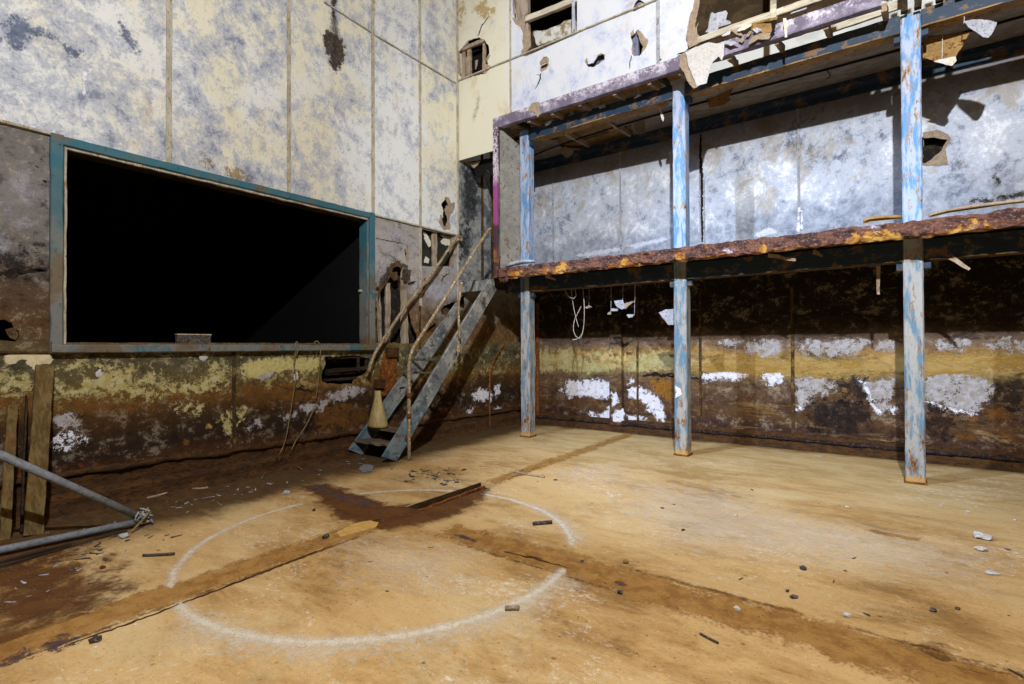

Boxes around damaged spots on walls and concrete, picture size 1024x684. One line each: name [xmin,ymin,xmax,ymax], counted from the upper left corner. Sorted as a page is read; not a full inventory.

leakage [322,0,347,74]
peeling [679,24,725,88]
spalling [922,137,947,165]
spalling [376,252,464,344]
rust [534,265,585,273]
rust [649,253,699,261]
rust [714,237,861,254]
peeling [0,353,111,399]
leakage [539,346,674,422]
leakage [691,337,899,435]
leakage [924,336,1024,440]
leakage [51,412,89,452]